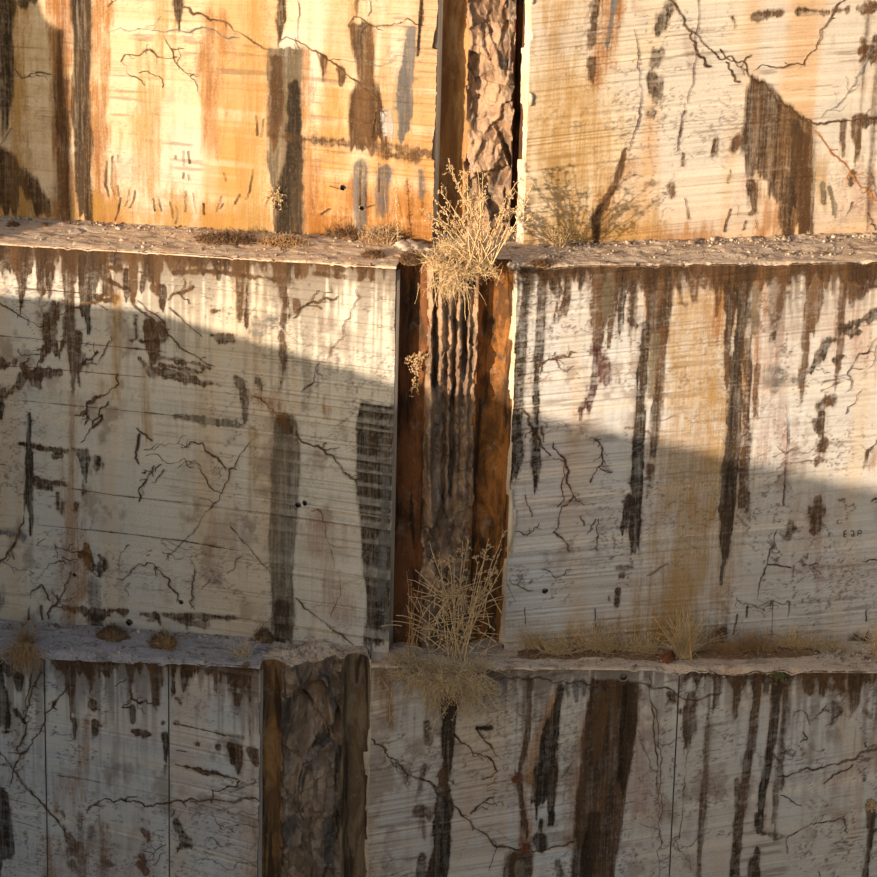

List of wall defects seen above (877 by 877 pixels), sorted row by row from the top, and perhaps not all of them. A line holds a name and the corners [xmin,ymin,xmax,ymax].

water stain [0,0,93,221]
rust [48,0,72,153]
rust [89,0,121,224]
rust [199,47,212,136]
crack [120,2,386,116]
water stain [729,78,815,236]
crack [669,0,877,230]
crack [0,278,213,377]
crack [117,428,270,609]
water stain [52,660,260,775]
water stain [503,675,641,877]
water stain [666,670,877,877]